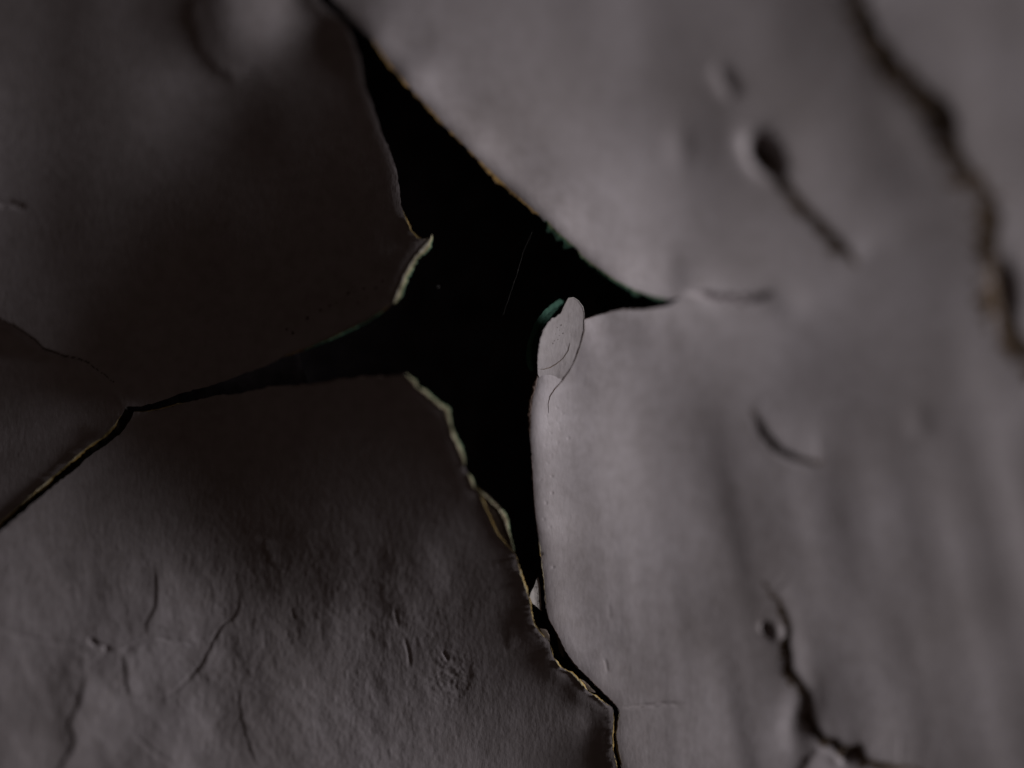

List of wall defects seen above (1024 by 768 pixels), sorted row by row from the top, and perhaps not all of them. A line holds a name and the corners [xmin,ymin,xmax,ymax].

crack [0,309,307,547]
peeling [130,0,803,768]
crack [728,383,852,483]